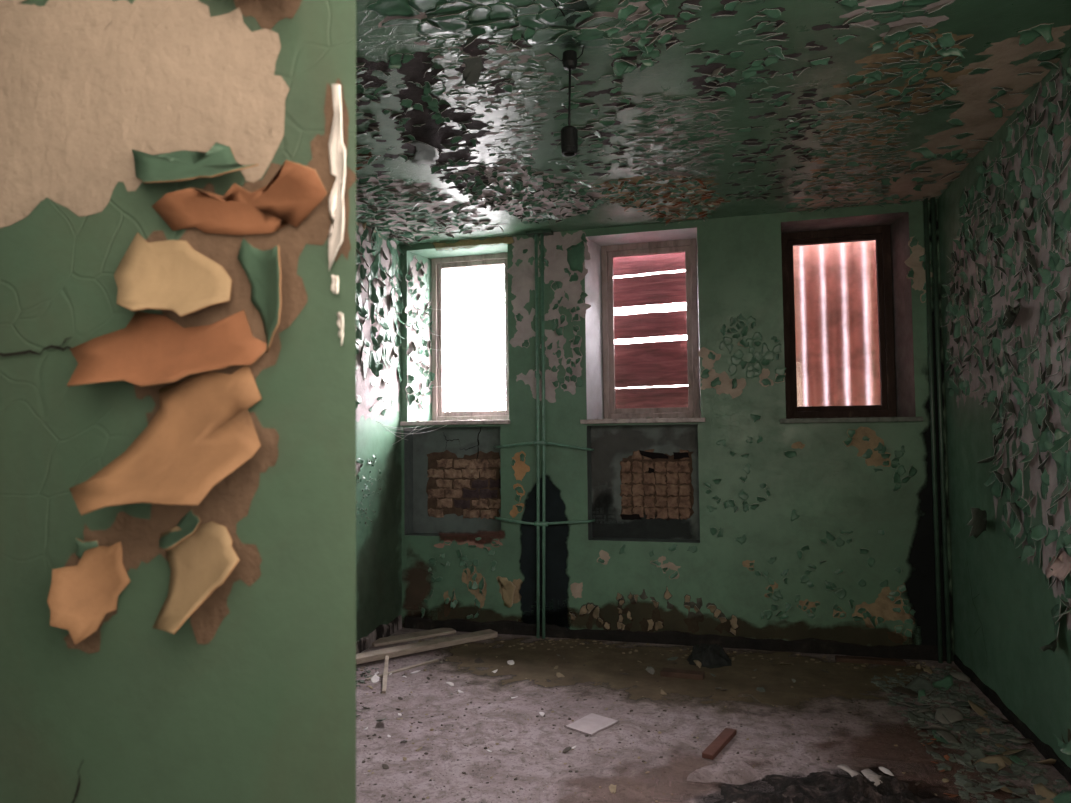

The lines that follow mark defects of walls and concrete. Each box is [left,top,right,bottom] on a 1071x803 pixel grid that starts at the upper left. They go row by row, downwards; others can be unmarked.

spalling [0,0,820,654]
peeling [776,0,1071,652]
leakage [403,601,924,716]